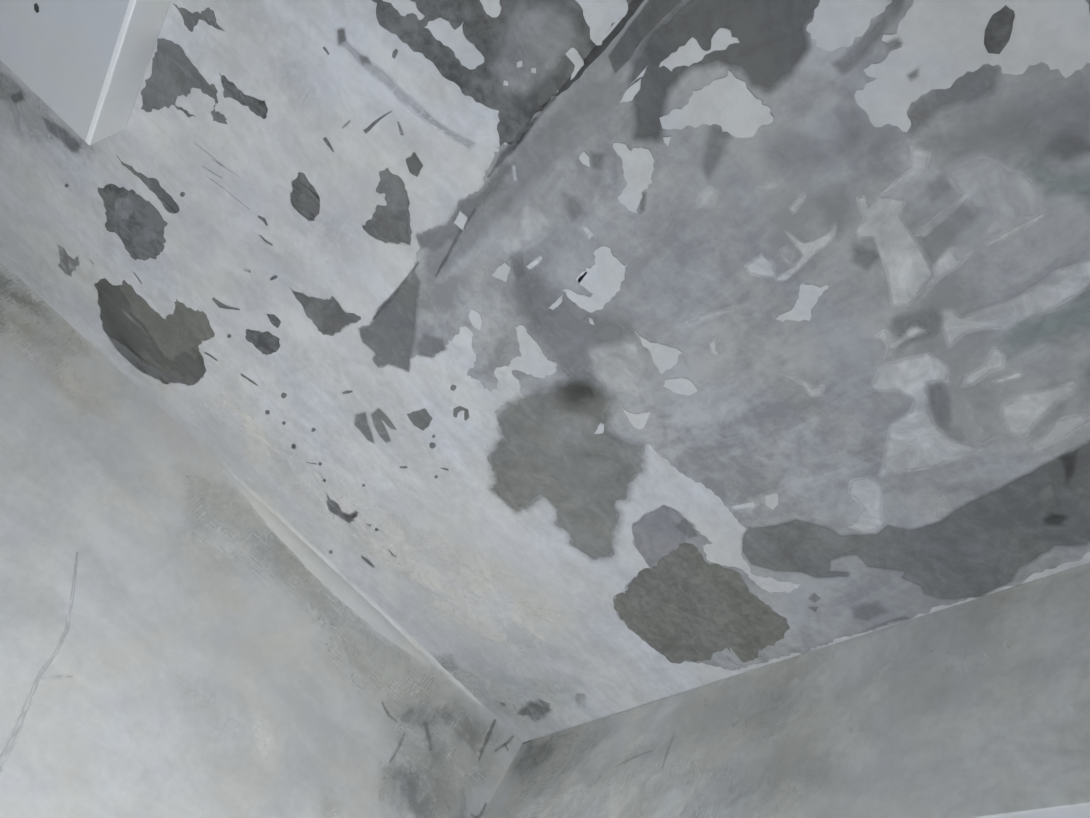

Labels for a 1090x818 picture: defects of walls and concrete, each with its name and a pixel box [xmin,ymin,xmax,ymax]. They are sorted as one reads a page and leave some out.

peeling [173,3,225,32]
peeling [141,38,268,124]
peeling [57,244,93,277]
peeling [94,155,231,386]
spalling [212,297,240,310]
peeling [245,314,281,355]
peeling [289,0,1090,671]
crack [0,559,77,769]